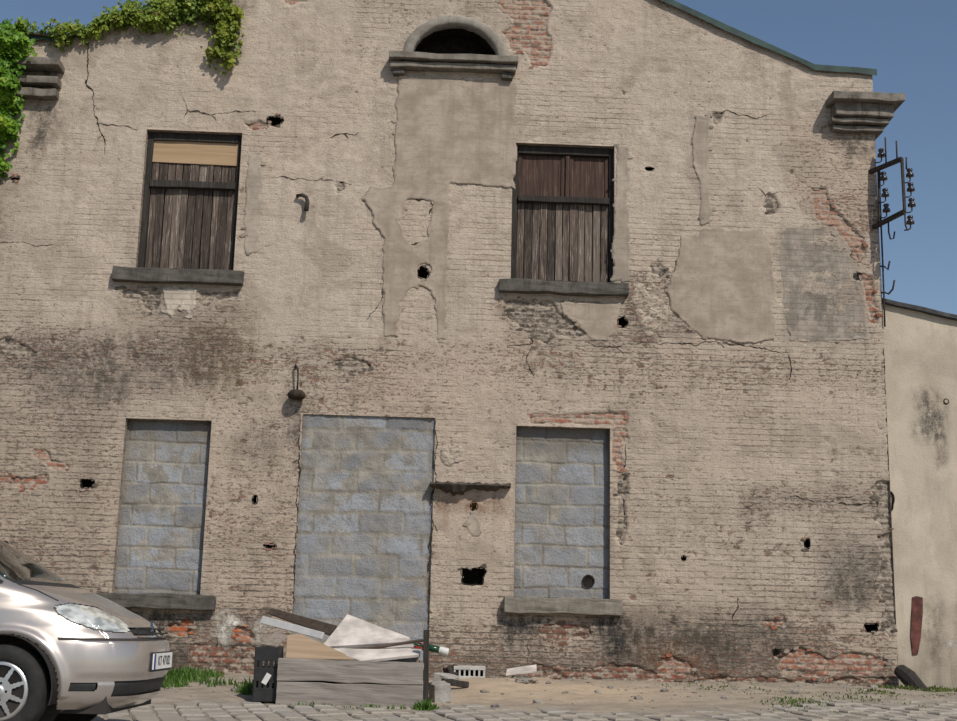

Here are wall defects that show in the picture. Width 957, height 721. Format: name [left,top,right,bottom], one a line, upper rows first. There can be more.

spalling [495,0,553,68]
crack [85,47,138,153]
crack [181,93,256,120]
flaking render [779,188,882,343]
flaking render [115,285,238,318]
spalling [502,297,629,345]
spalling [164,618,255,674]
spalling [538,620,594,651]
spalling [512,646,896,688]